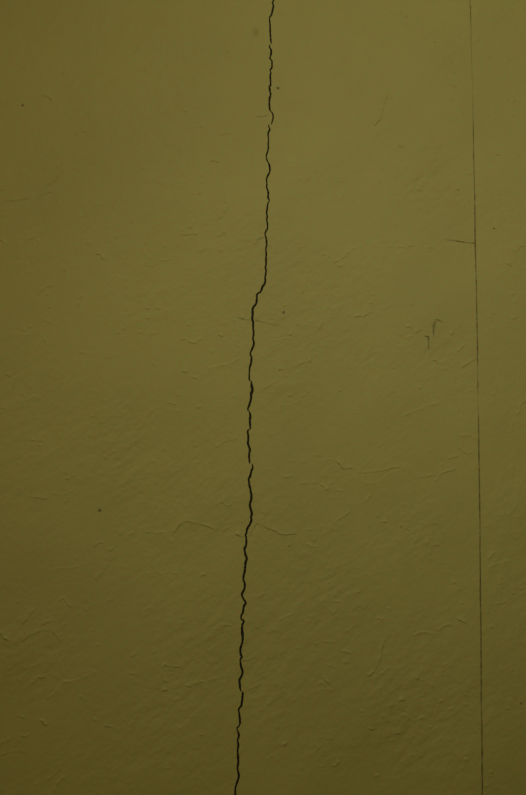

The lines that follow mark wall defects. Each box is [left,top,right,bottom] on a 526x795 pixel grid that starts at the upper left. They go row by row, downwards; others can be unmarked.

crack [234,0,274,795]